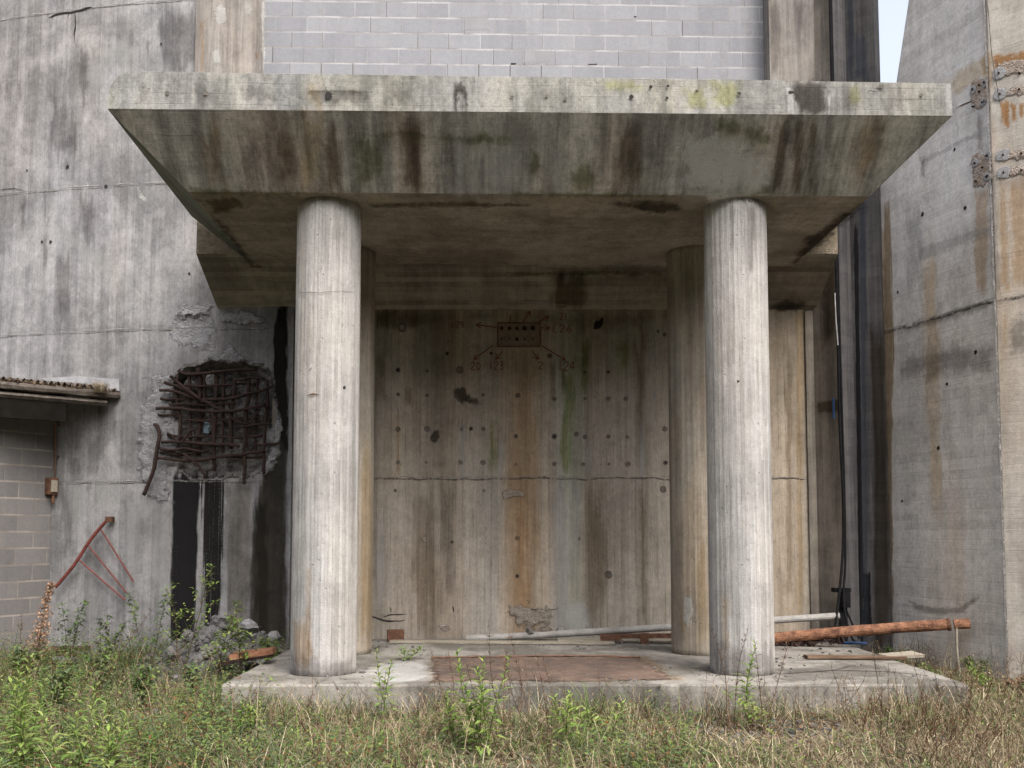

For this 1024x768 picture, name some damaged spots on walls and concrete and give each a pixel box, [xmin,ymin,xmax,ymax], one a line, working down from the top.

spalling [136,303,283,503]
damp [170,469,224,644]